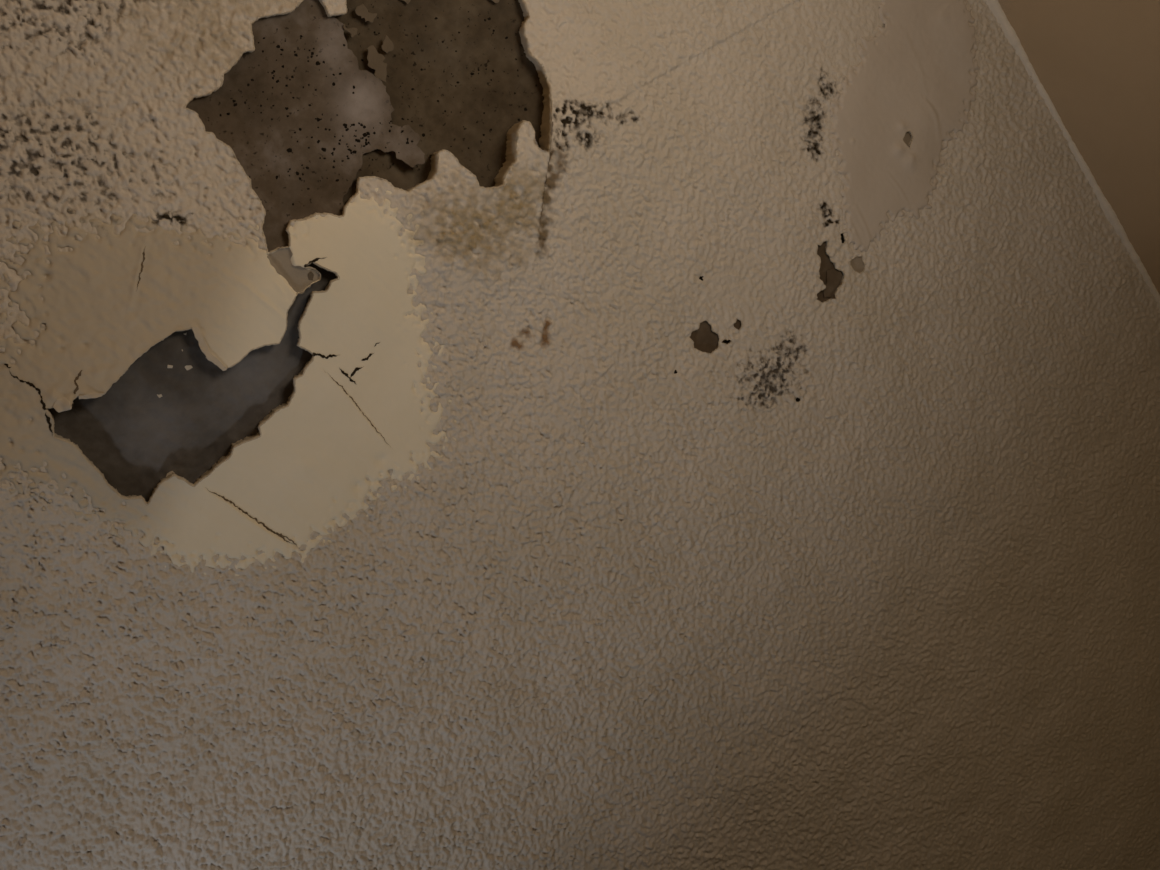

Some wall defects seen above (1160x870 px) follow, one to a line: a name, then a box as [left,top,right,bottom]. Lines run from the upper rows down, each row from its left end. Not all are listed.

peeling [45,0,553,506]
peeling [816,232,866,303]
peeling [689,319,743,354]
crack [312,342,390,446]
crack [208,490,297,545]